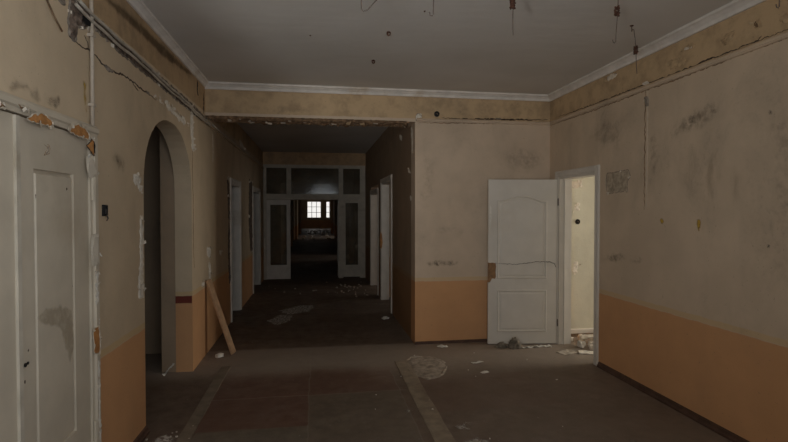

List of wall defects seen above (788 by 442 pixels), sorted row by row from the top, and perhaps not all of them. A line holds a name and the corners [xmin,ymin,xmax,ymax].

peeling [18,103,54,129]
crack [69,35,153,97]
flaking render [58,0,422,156]
crack [420,29,788,208]